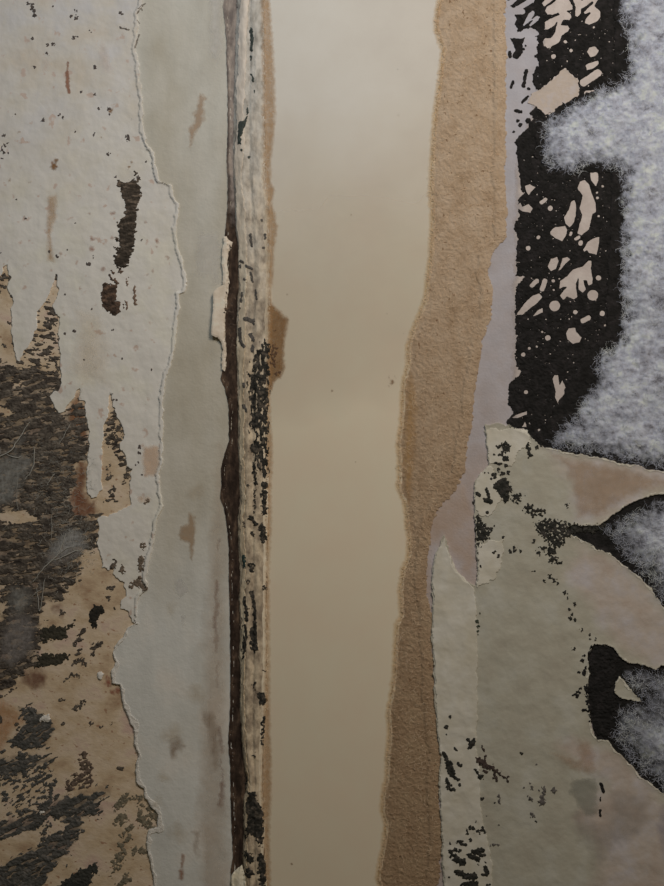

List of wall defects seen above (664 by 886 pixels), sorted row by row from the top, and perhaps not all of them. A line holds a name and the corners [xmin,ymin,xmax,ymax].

water stain [0,299,148,698]
water stain [0,703,158,886]
peeling [0,0,187,623]
water stain [223,1,434,886]